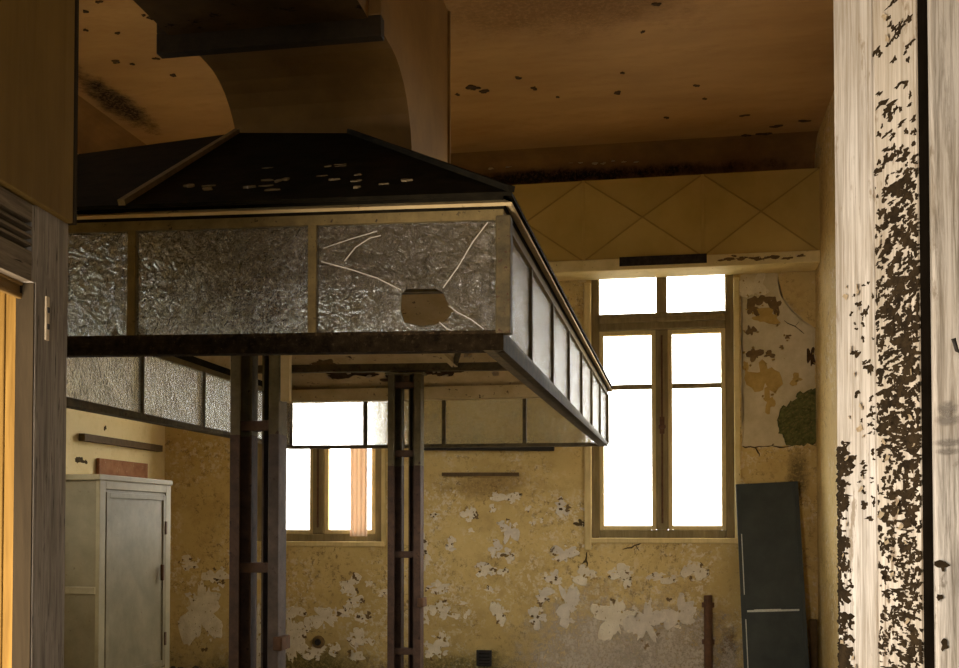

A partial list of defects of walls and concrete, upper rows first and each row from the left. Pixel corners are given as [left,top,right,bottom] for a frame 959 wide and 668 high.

peeling [872,0,916,63]
spalling [739,273,816,448]
peeling [836,80,924,668]
peeling [178,555,229,652]
peeling [286,572,387,664]
peeling [424,579,470,661]
peeling [459,491,543,627]
peeling [555,496,584,527]
peeling [528,544,710,650]
peeling [934,560,950,572]